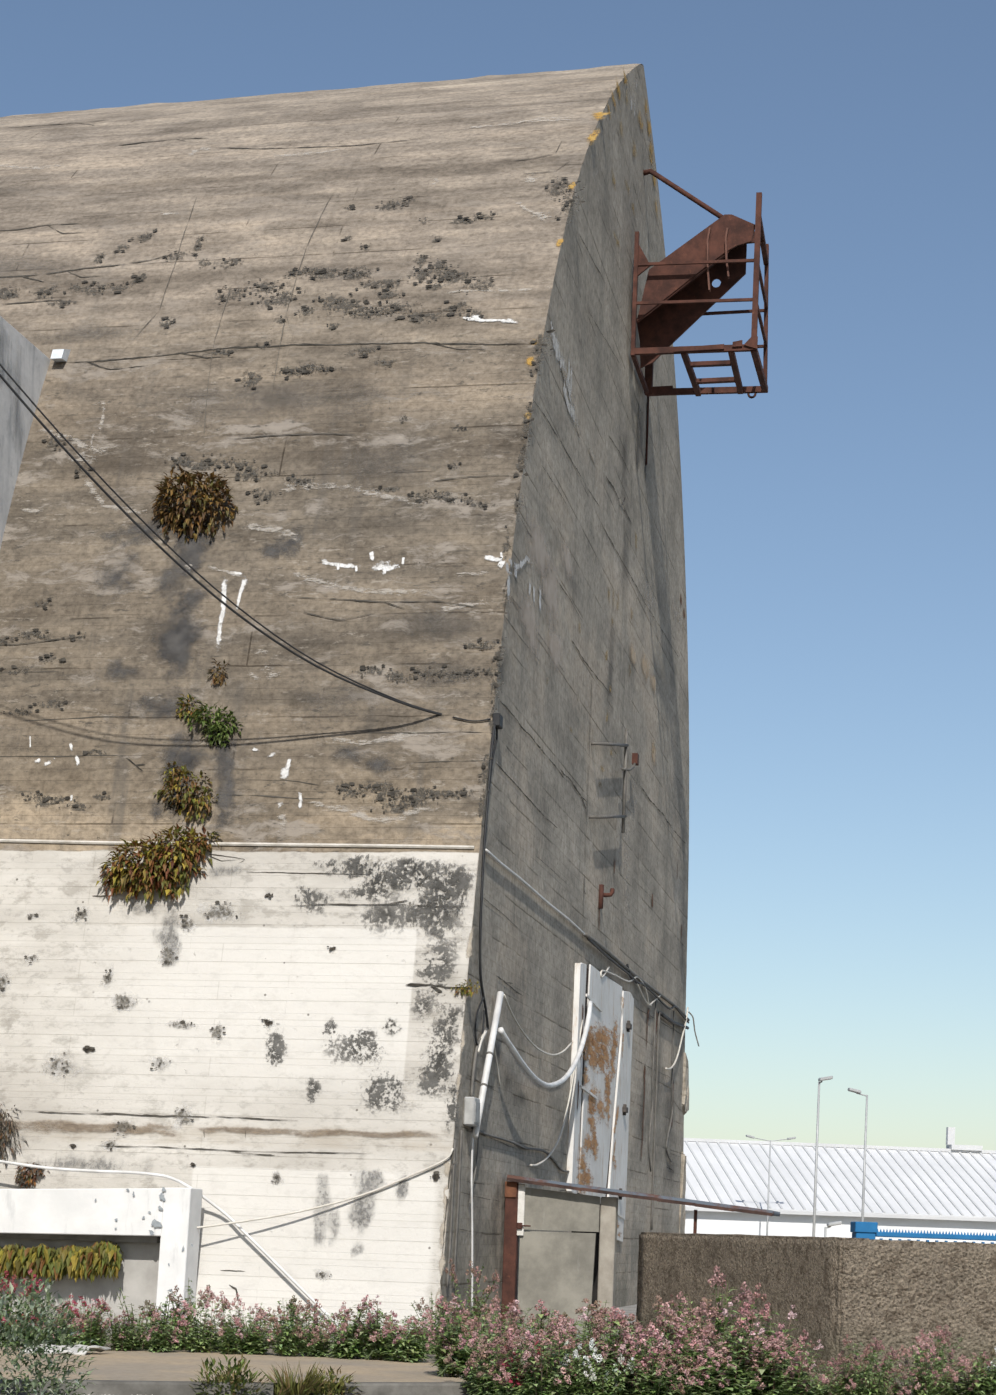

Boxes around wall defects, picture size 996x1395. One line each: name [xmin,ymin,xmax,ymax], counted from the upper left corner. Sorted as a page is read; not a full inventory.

leakage [294,886,328,912]
leakage [161,917,178,960]
leakage [316,854,470,1129]
leakage [266,1033,286,1066]
leakage [307,1080,321,1102]
rust [577,997,624,1192]
leakage [0,1121,167,1137]
leakage [206,1127,425,1137]